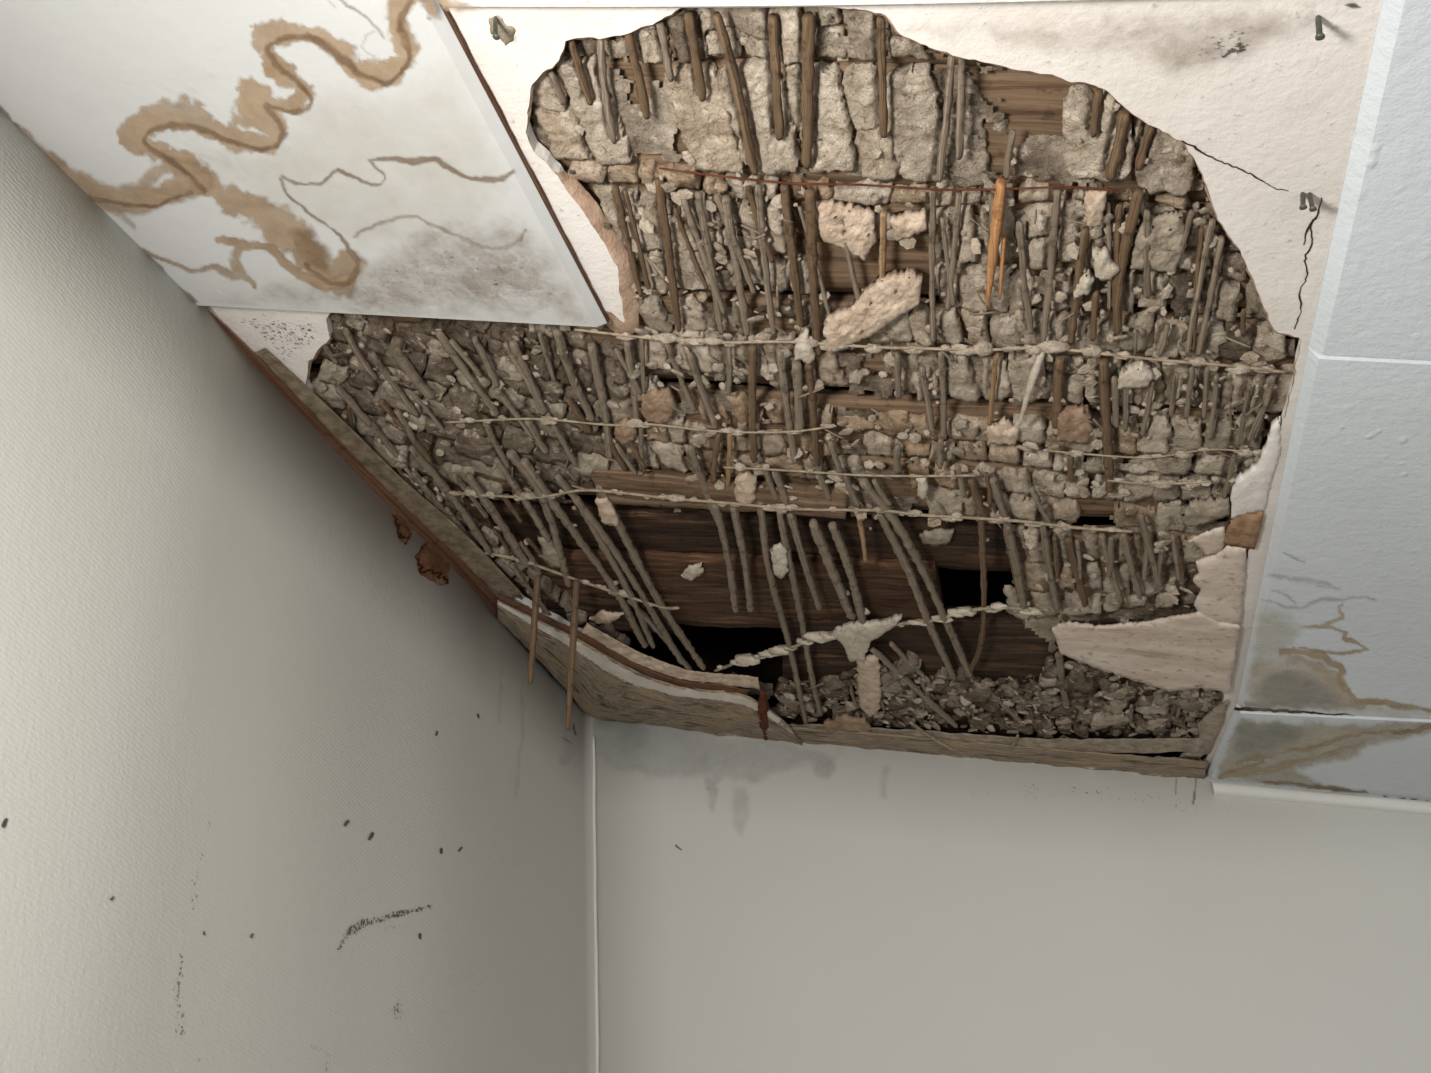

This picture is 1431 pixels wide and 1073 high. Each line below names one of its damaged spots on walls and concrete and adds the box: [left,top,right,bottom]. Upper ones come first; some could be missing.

leakage [0,0,514,298]
crack [1181,140,1288,191]
leakage [371,223,538,303]
crack [1294,198,1322,329]
spalling [305,7,1301,739]
leakage [1218,604,1431,793]